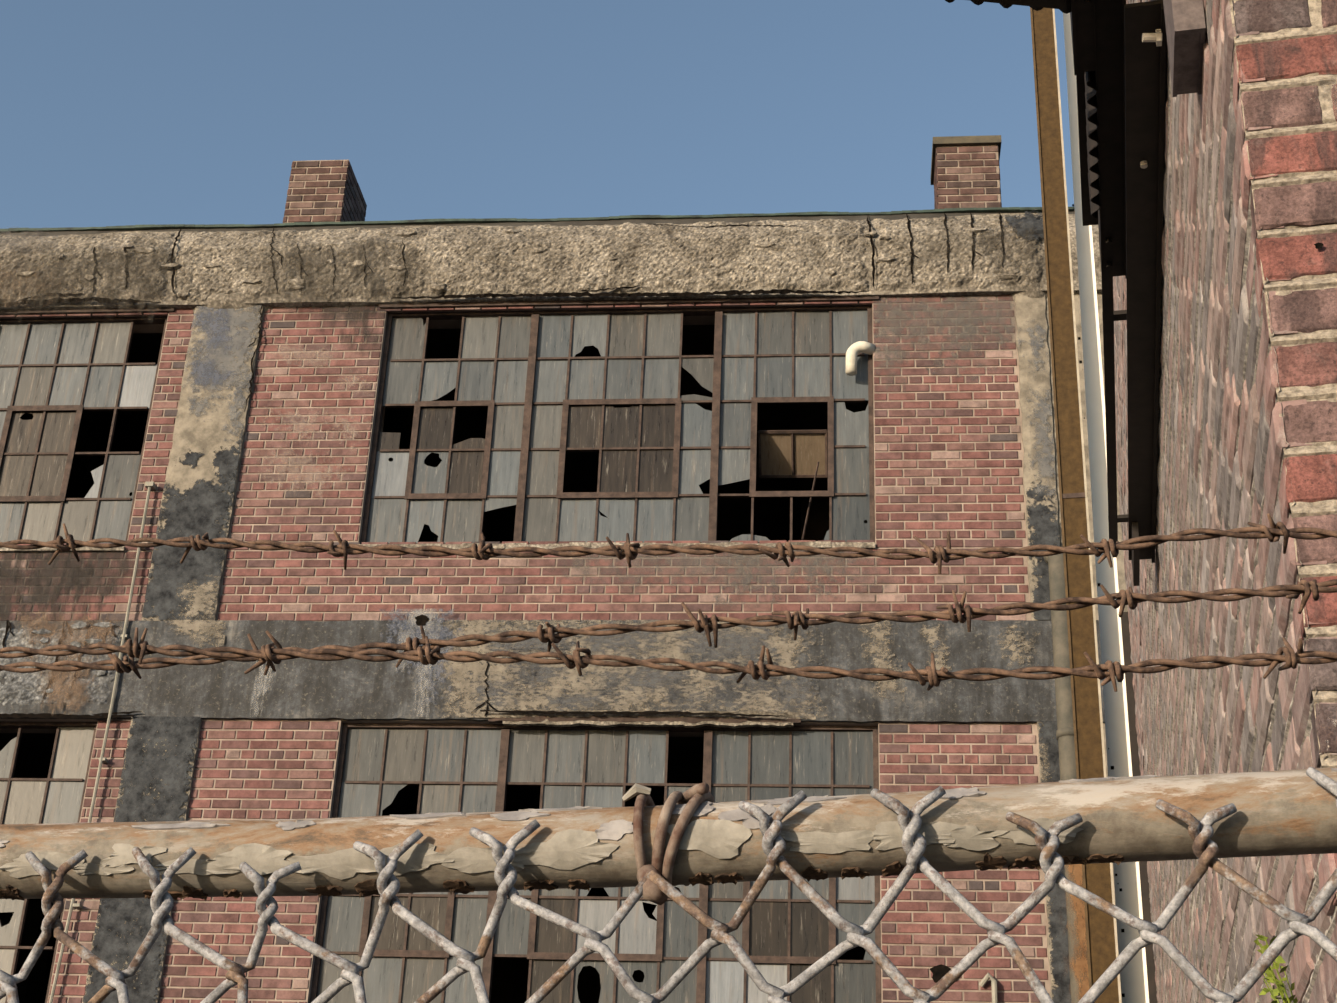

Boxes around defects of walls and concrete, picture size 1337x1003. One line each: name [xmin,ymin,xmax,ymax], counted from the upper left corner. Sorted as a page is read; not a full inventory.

crack [906,210,1005,284]
crack [244,217,875,412]
water stain [380,609,464,702]